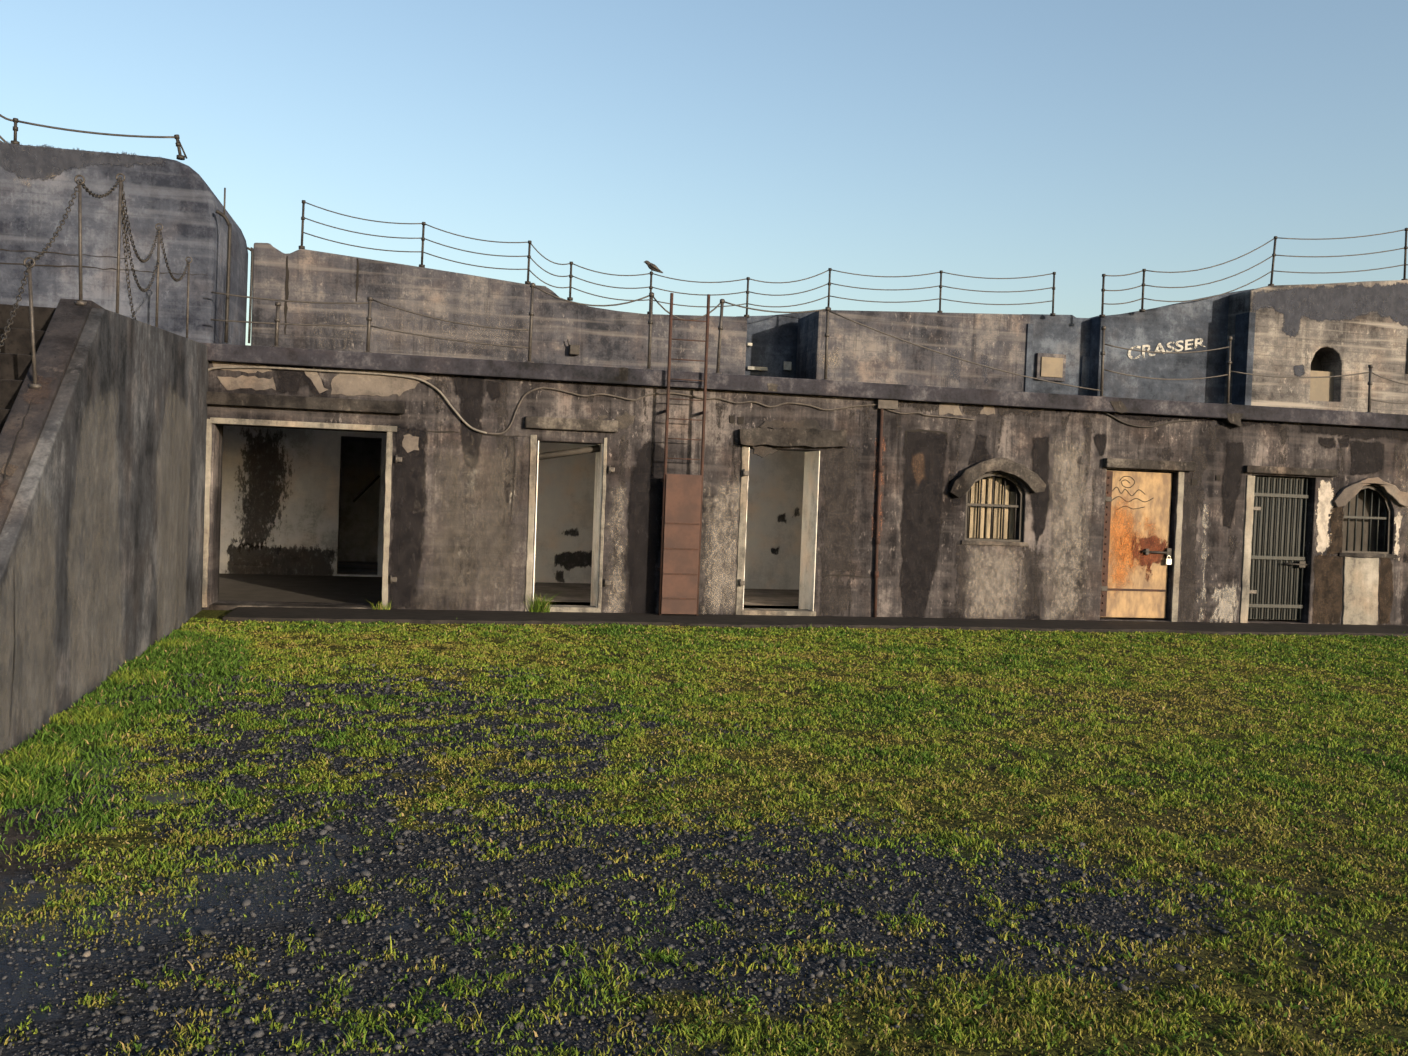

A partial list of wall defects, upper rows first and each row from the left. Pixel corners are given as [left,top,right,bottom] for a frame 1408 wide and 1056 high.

peeling [212,362,276,390]
peeling [304,367,431,396]
water stain [1294,365,1305,377]
peeling [554,528,592,583]
water stain [610,388,664,613]
corrosion [873,441,884,537]
corrosion [1110,508,1170,582]
water stain [895,401,1408,625]
peeling [1315,480,1343,553]
peeling [1394,512,1402,561]